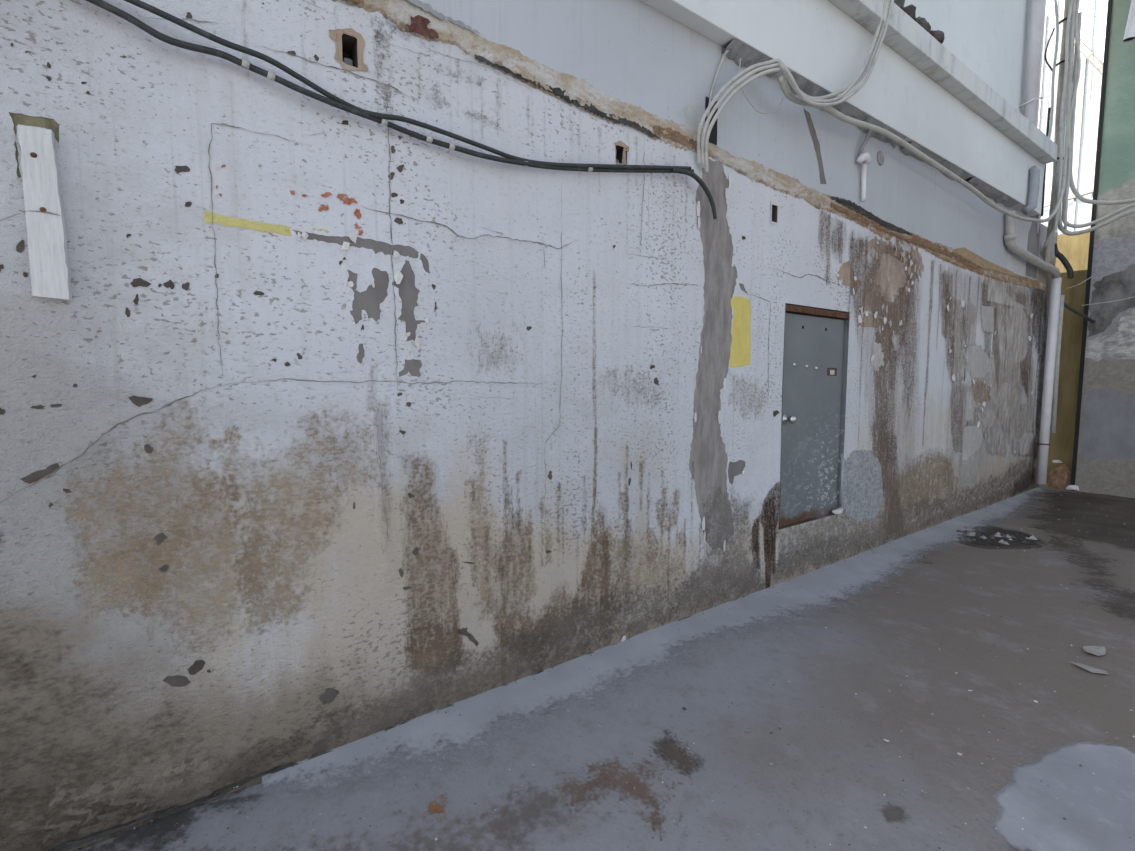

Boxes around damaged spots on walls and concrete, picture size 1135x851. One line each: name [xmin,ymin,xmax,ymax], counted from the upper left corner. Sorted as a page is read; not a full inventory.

spalling [0,105,70,181]
spalling [329,28,368,72]
spalling [128,396,153,407]
peeling [125,278,190,317]
crack [0,45,577,538]
spalling [286,217,437,407]
spalling [342,0,1045,490]
damp [776,288,1047,578]
damp [70,411,366,649]
damp [312,458,763,756]
damp [73,791,260,851]